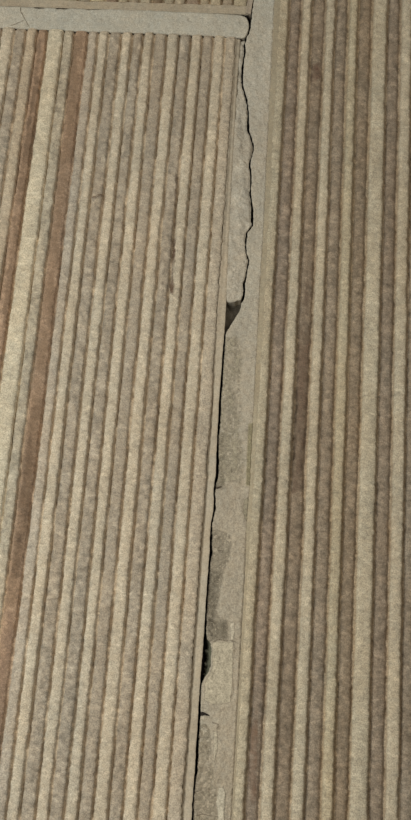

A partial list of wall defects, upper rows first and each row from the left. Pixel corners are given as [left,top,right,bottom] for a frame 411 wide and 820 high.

crack [230,14,254,302]
crack [192,334,234,820]